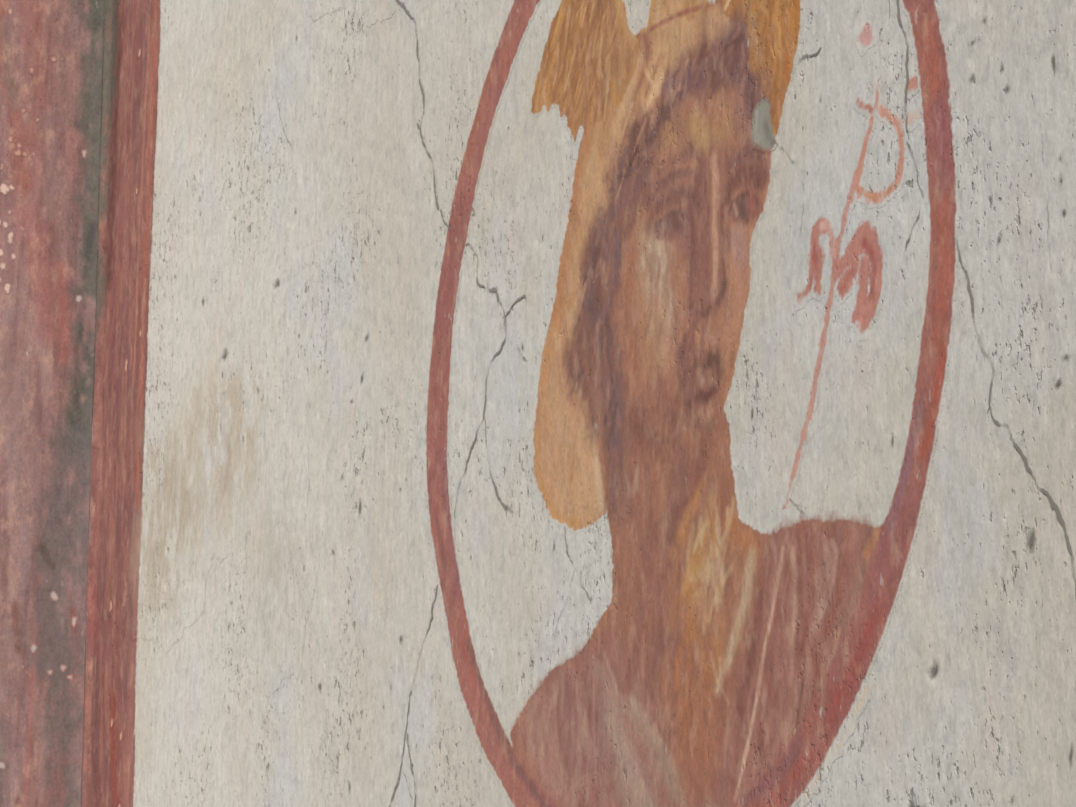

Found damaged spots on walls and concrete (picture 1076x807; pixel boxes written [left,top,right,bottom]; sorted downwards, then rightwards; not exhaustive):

crack [396,0,469,245]
peeling [0,135,28,295]
crack [953,237,974,317]
crack [465,277,527,510]
crack [987,380,1072,557]
crack [426,585,438,635]
crack [389,692,416,807]